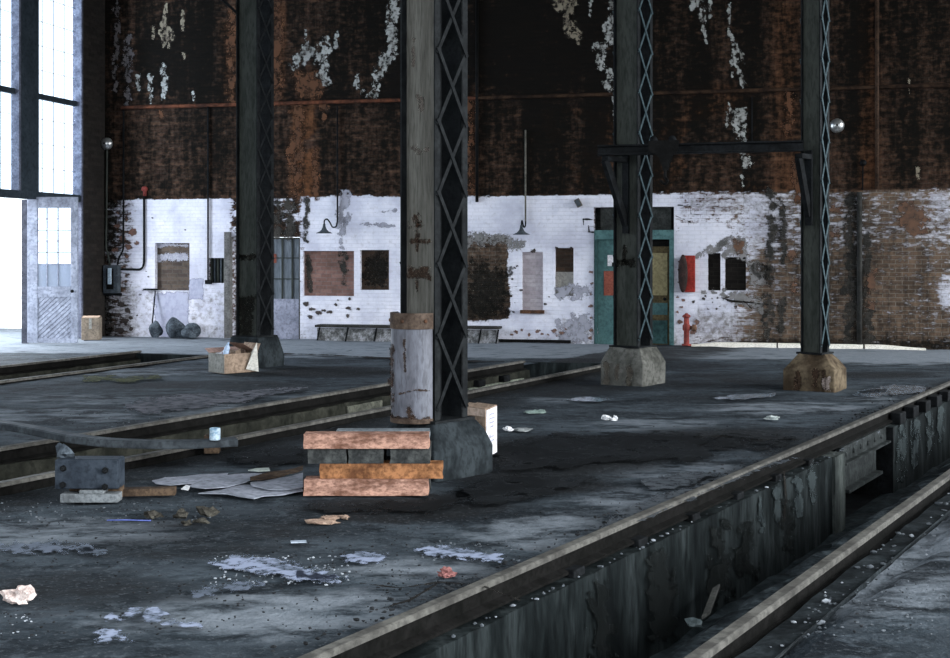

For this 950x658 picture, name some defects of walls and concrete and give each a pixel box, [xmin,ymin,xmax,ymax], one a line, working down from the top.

rust [274,0,330,201]
peeling [111,212,139,258]
water stain [751,187,788,340]
spalling [896,200,932,237]
peeling [108,298,138,334]
rust [388,339,431,420]
spalling [393,387,950,658]